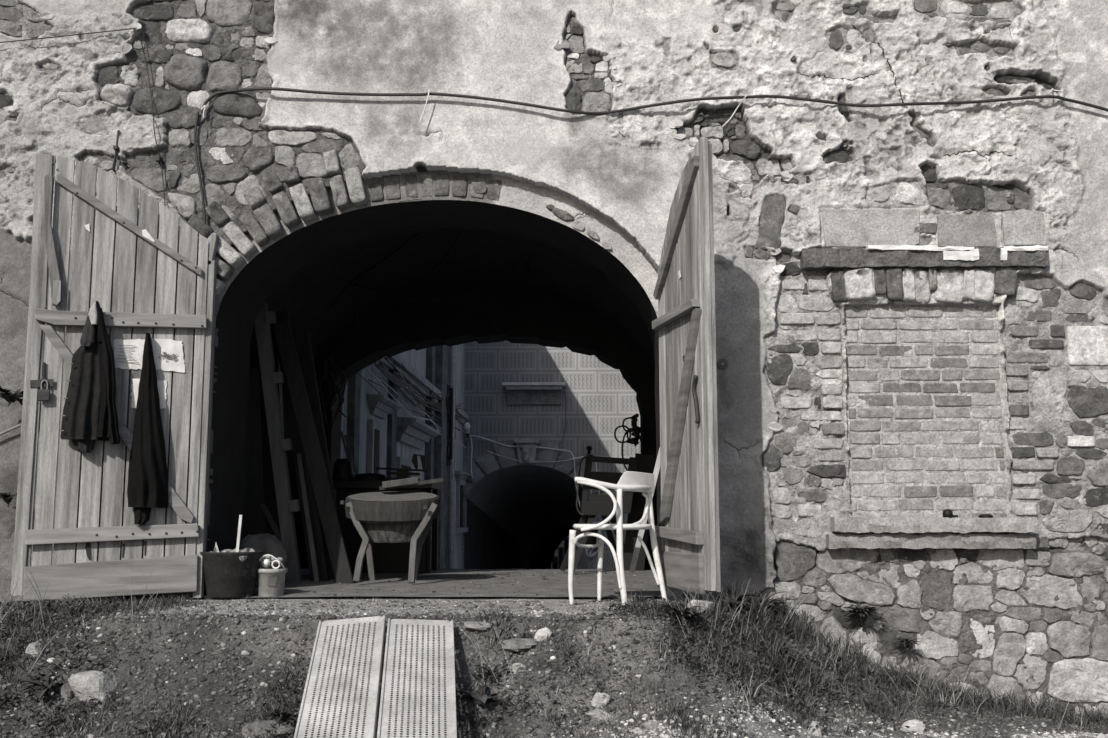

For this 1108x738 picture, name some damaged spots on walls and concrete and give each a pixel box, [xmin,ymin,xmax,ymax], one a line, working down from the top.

flaking render [0,0,55,39]
flaking render [39,61,62,72]
flaking render [553,15,622,115]
flaking render [0,91,20,124]
flaking render [79,0,366,245]
flaking render [668,106,811,185]
flaking render [838,94,851,122]
flaking render [908,113,936,147]
flaking render [866,164,1032,213]
flaking render [744,246,850,572]
flaking render [1000,267,1108,551]